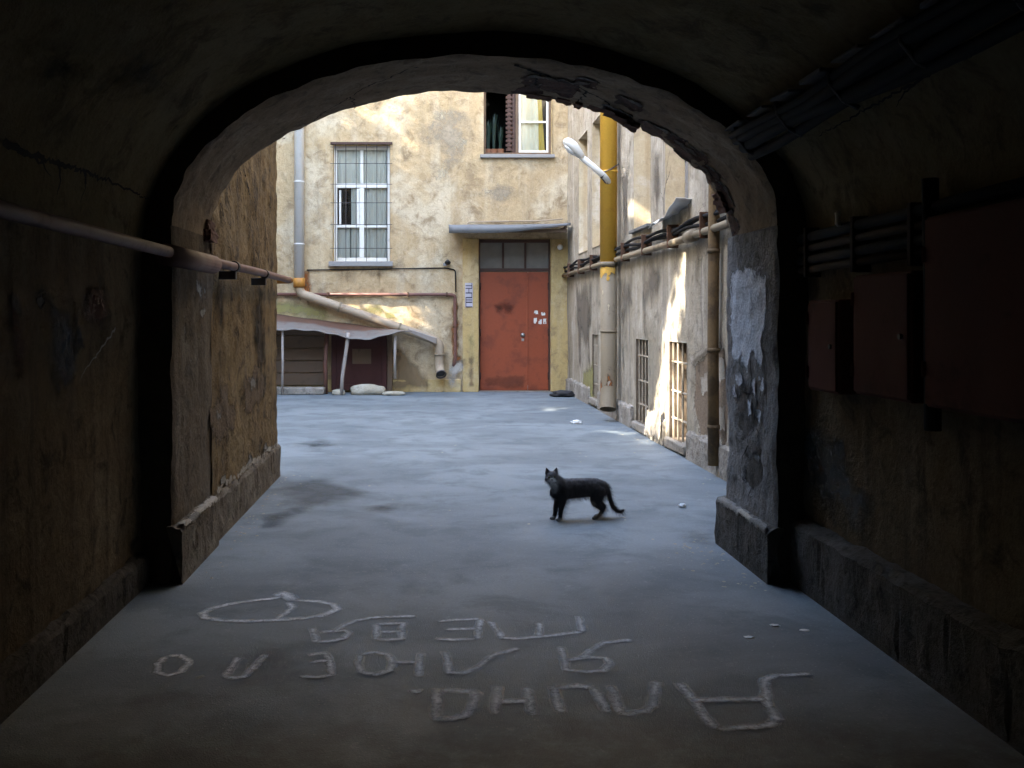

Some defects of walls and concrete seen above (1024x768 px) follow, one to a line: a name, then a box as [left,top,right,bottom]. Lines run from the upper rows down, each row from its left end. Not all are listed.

spalling [511,77,600,95]
crack [2,138,149,202]
peeling [688,268,766,445]
spalling [179,442,278,526]